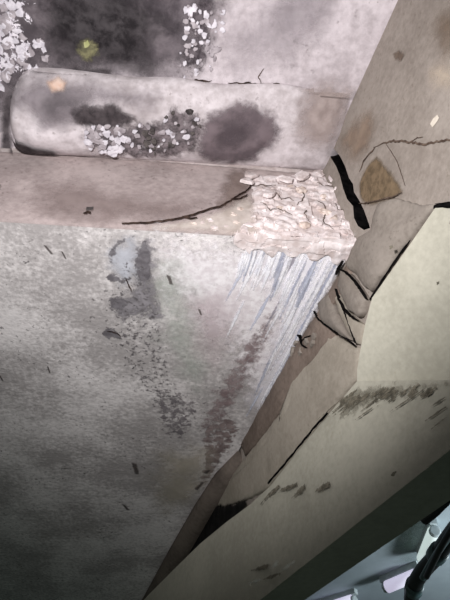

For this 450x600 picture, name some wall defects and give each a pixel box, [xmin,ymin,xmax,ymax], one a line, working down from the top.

peeling [0,0,50,92]
damp [0,0,215,156]
peeling [179,3,226,78]
peeling [83,109,203,158]
crack [122,185,252,224]
crack [331,137,450,230]
damp [103,103,346,438]
crack [313,260,367,346]
rust [201,325,269,482]